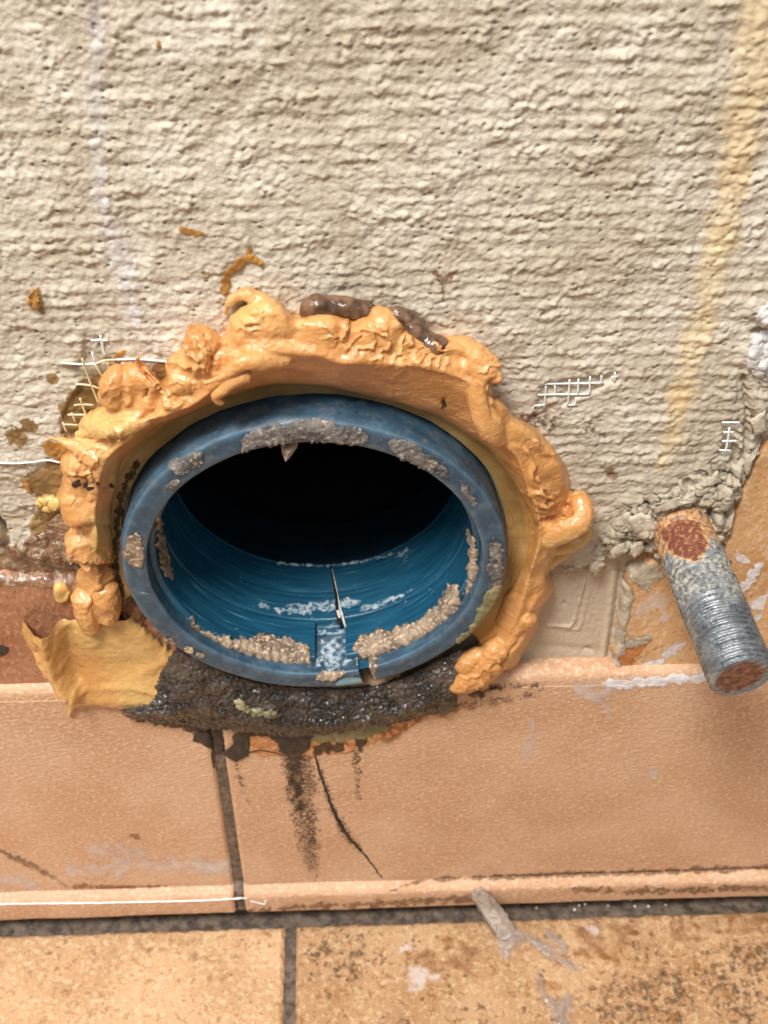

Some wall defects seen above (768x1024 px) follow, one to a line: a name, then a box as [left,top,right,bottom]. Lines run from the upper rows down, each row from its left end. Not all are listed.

spalling [589,410,768,578]
leakage [283,755,321,876]
crack [247,750,396,891]